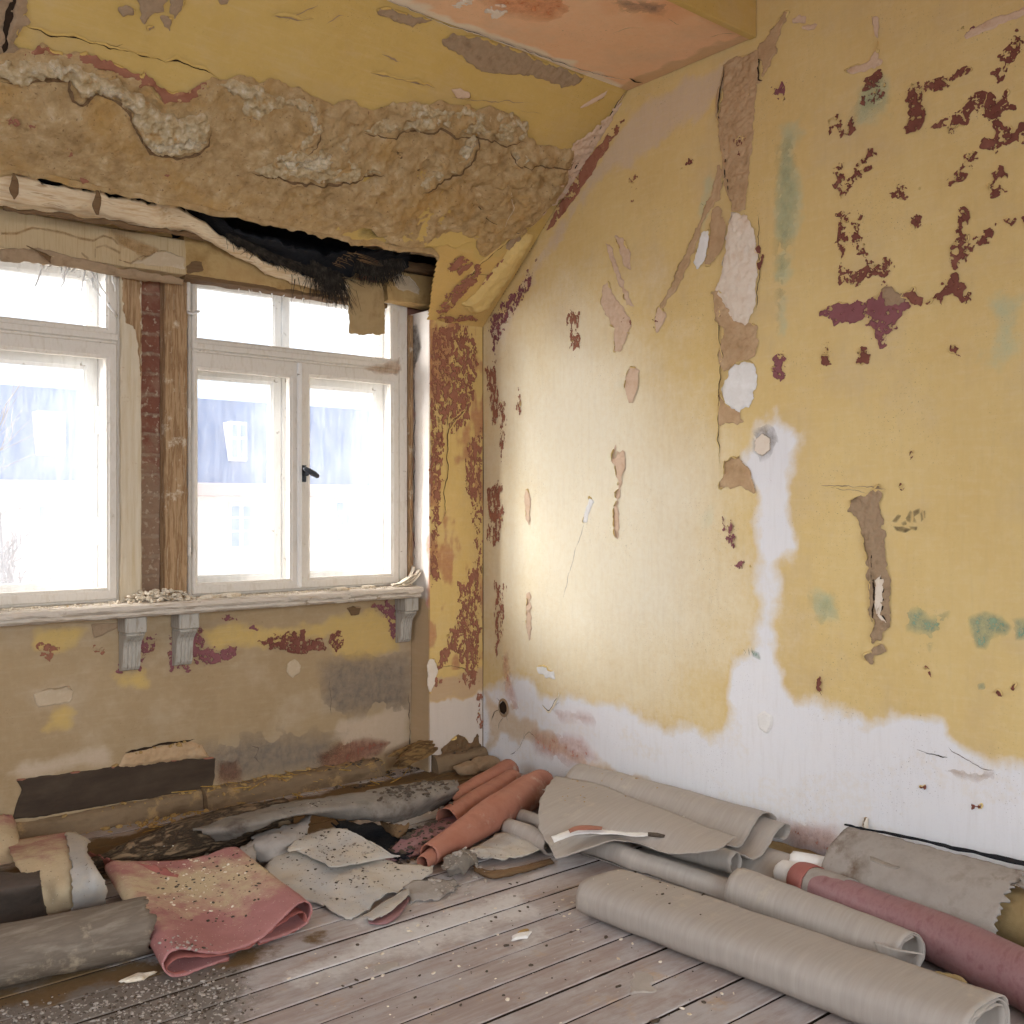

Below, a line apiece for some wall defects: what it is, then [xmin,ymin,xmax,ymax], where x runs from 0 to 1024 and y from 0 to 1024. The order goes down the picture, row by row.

crack [27,26,218,78]
peeling [844,16,886,106]
peeling [903,7,1024,199]
spalling [652,10,817,333]
peeling [832,148,877,198]
peeling [819,203,1024,365]
spalling [0,0,626,754]
spalling [710,291,759,426]
peeling [771,353,786,382]
spalling [718,456,755,494]
spalling [847,484,891,665]
spalling [119,739,240,780]